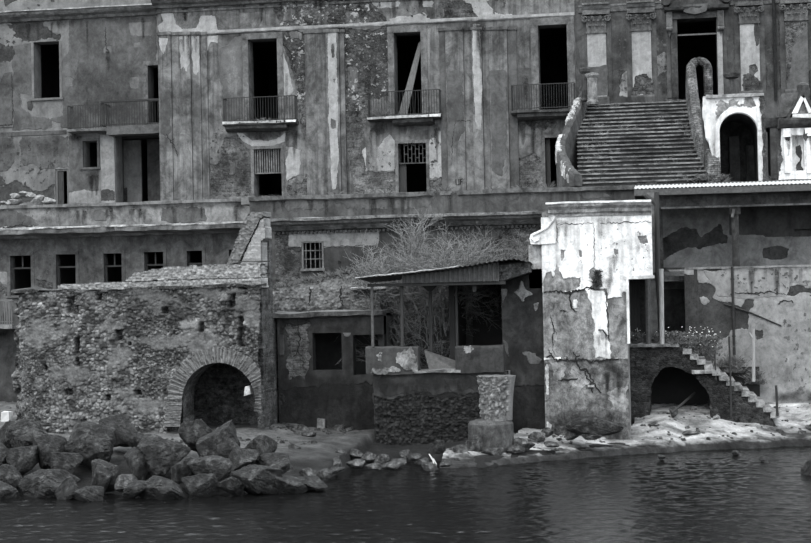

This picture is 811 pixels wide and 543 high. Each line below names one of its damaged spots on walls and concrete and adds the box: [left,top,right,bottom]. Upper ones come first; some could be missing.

peeling [0,0,512,228]
flaking render [588,65,608,96]
flaking render [619,37,667,97]
flaking render [715,22,809,181]
crack [556,220,650,264]
flaking render [278,322,375,430]
peeling [371,346,418,375]
crack [544,285,619,393]
flaking render [501,205,811,440]